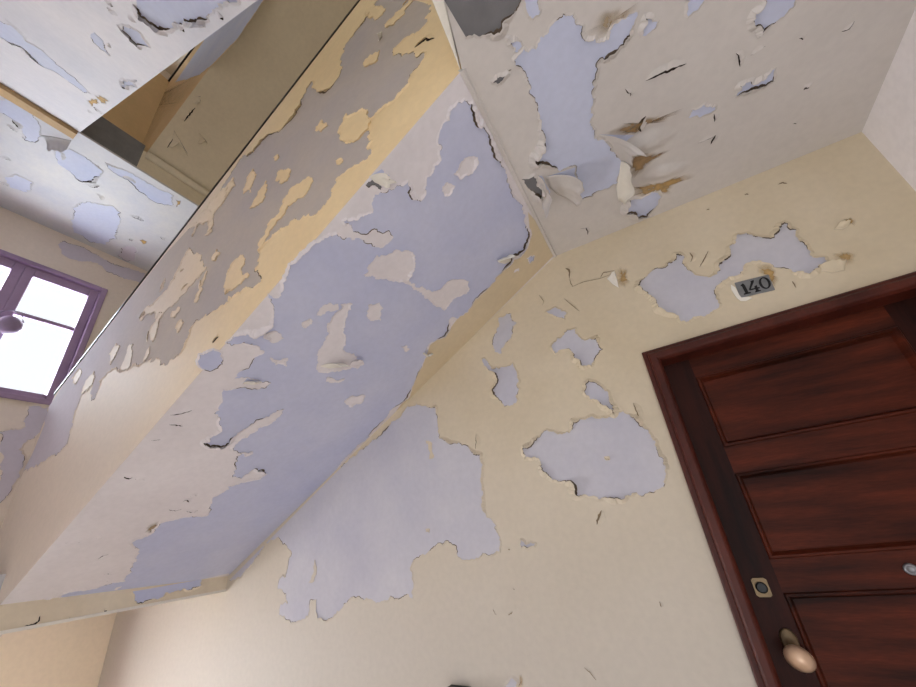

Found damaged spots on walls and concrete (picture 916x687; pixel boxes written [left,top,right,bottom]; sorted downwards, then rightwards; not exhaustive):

peeling [746,0,797,39]
peeling [734,67,777,98]
peeling [0,0,669,624]
peeling [633,220,846,324]